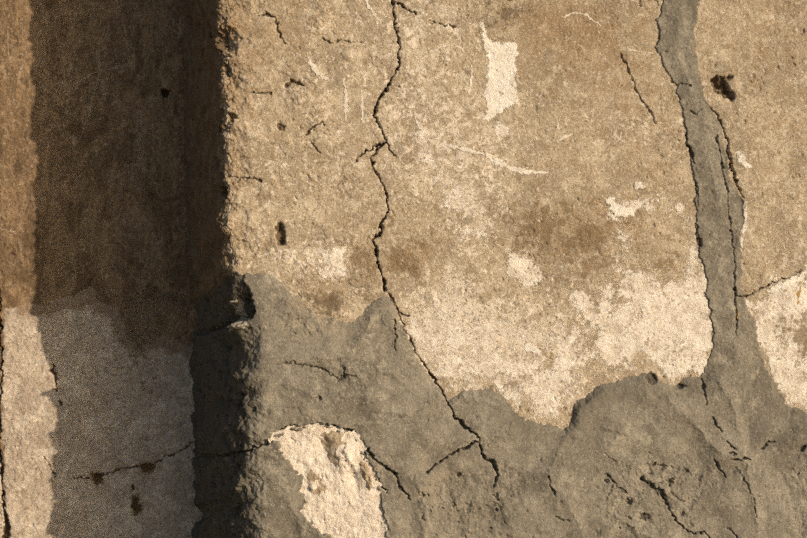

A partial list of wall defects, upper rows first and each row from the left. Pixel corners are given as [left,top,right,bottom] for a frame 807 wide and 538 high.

crack [620,54,656,124]
crack [356,2,456,355]
crack [685,134,695,164]
crack [715,136,799,334]
crack [0,299,8,399]
crack [0,418,11,538]
crack [43,442,193,479]
crack [225,423,408,498]
spalling [268,422,388,538]
crack [426,395,498,487]
crack [700,378,775,518]